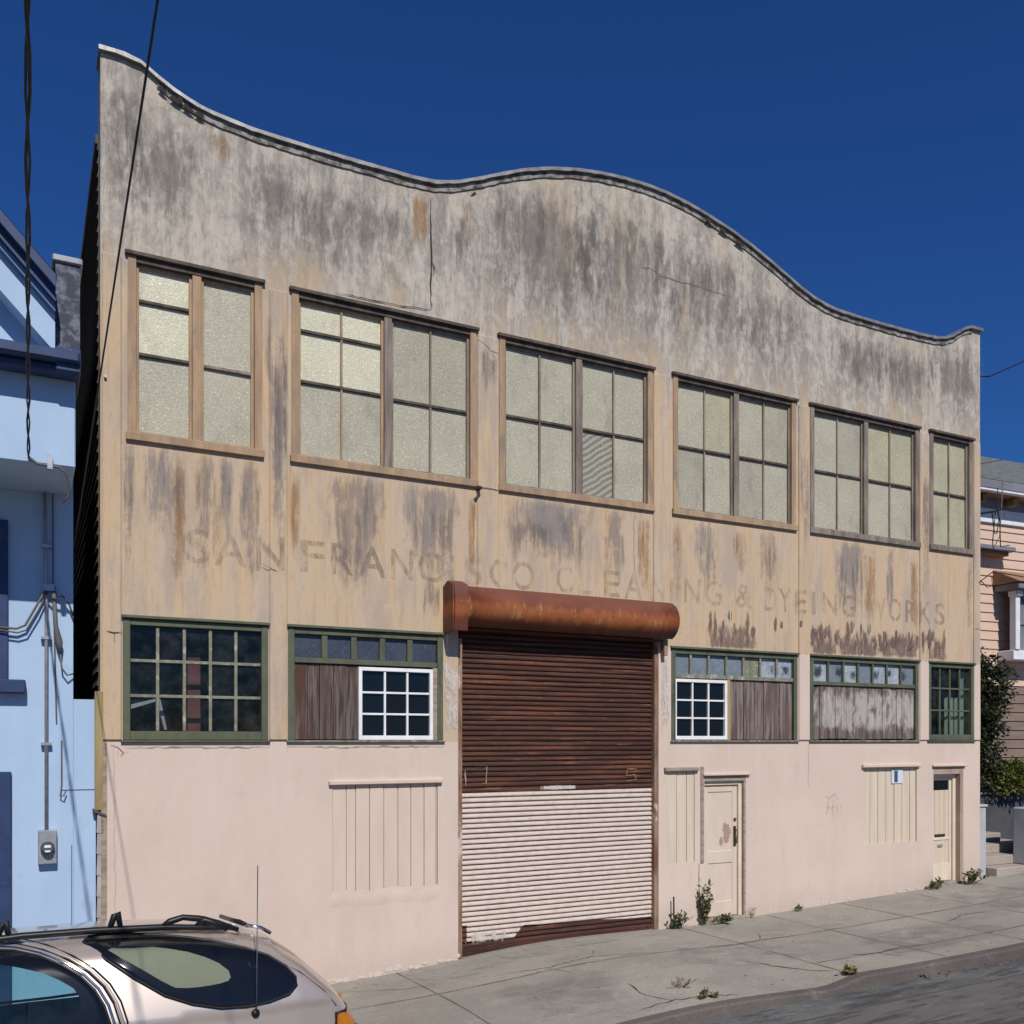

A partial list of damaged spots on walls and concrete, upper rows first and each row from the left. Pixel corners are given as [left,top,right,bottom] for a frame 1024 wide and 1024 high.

crack [338,211,435,310]
water stain [274,379,284,500]
peeling [709,610,756,648]
peeling [800,620,946,660]